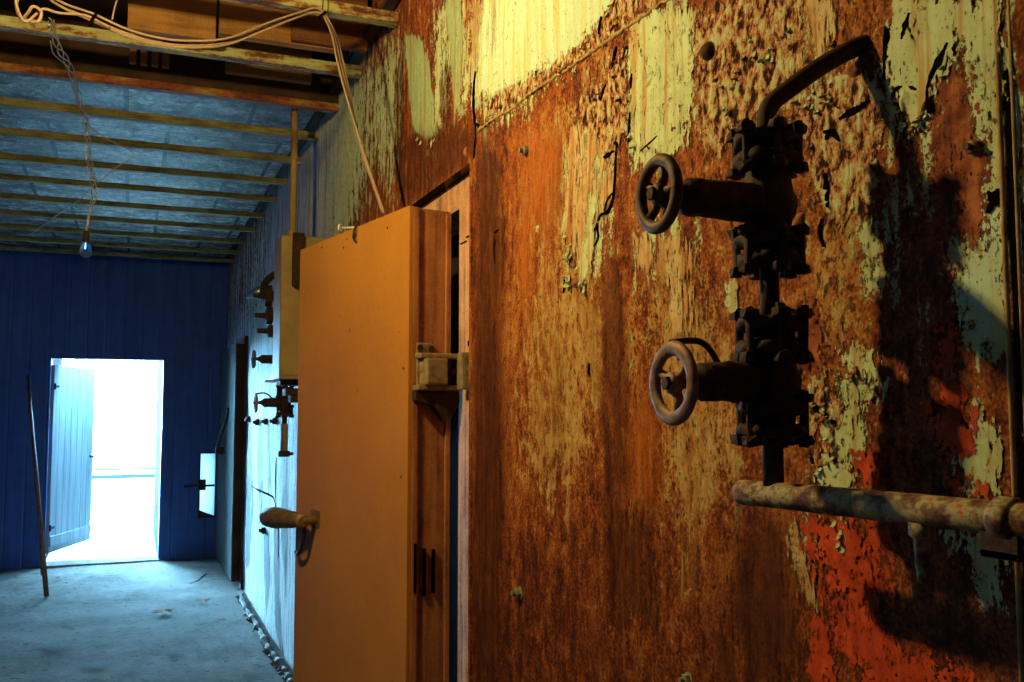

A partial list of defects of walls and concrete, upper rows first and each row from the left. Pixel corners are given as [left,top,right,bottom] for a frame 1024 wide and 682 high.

peeling [404,31,436,148]
rust [394,41,477,201]
rust [521,119,560,304]
peeling [478,0,698,295]
rust [792,212,804,226]
peeling [801,0,836,58]
peeling [874,0,1017,365]
rust [918,47,1002,267]
rust [594,260,654,580]
rust [786,294,831,382]
peeling [809,339,893,489]
peeling [940,397,1010,498]